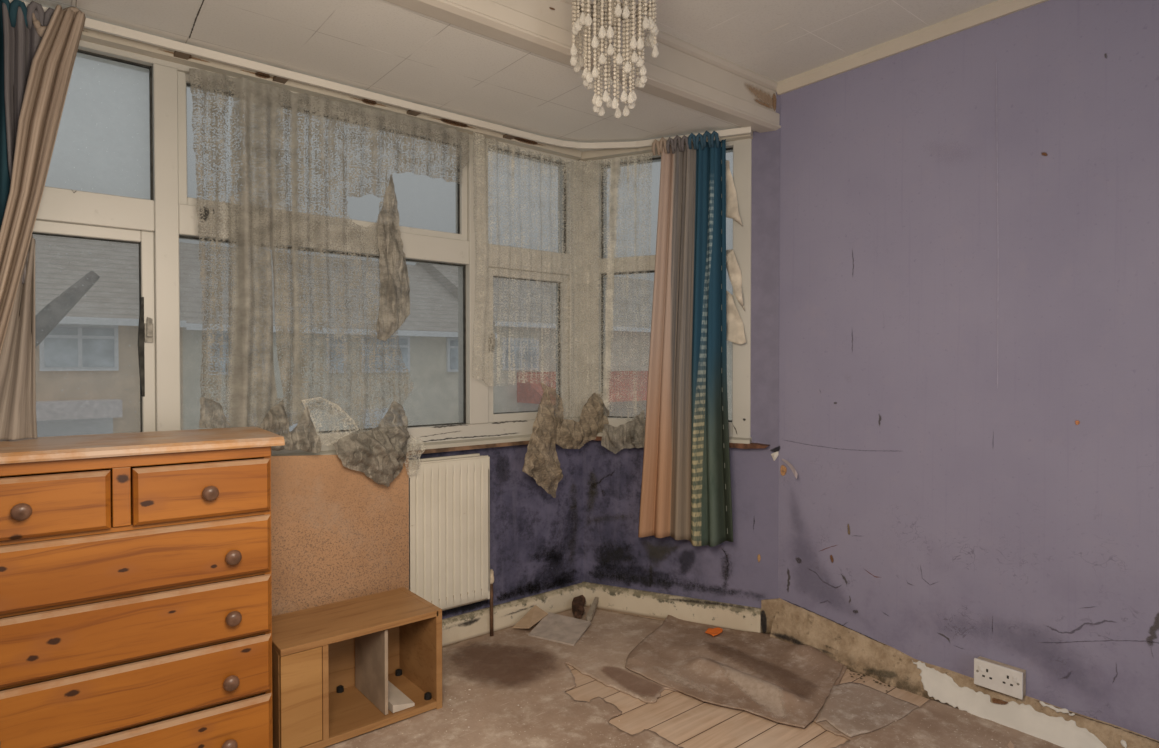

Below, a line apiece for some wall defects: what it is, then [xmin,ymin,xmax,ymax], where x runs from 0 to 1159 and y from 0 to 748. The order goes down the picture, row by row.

water stain [442,472,614,626]
water stain [590,544,767,633]
water stain [454,645,550,683]
peeling [912,660,1107,748]